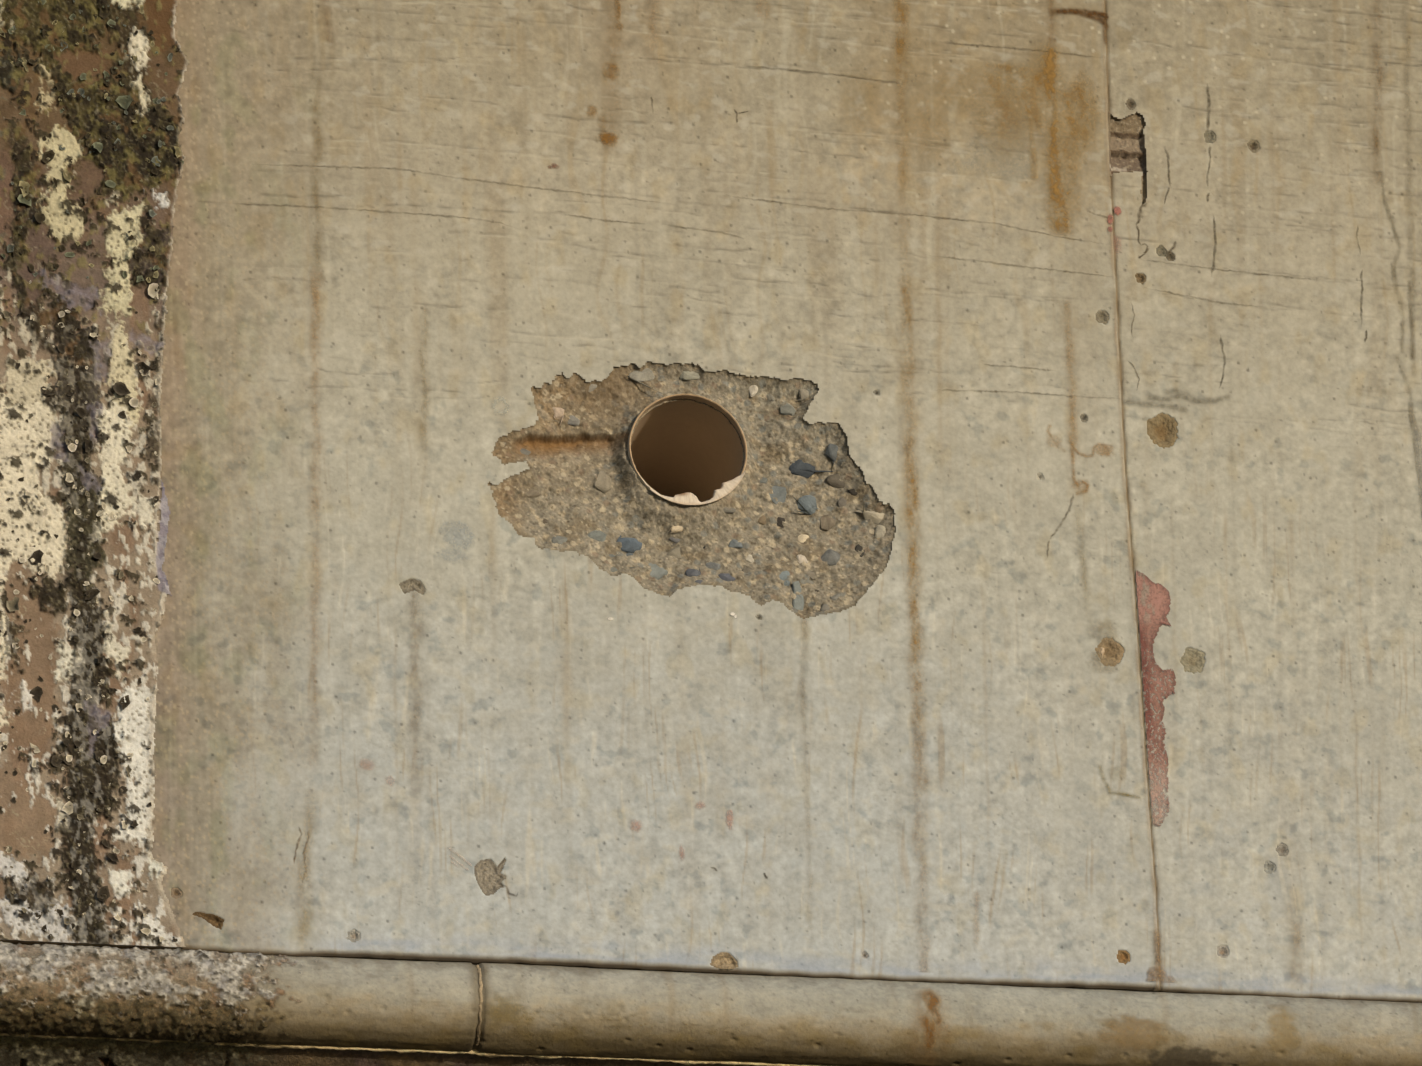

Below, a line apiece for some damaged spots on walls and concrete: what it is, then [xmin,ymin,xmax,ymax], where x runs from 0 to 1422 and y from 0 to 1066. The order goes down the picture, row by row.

rust [600,132,617,144]
rust [989,48,1094,232]
spalling [1108,111,1148,205]
spalling [488,361,896,619]
peeling [1136,571,1176,826]
peeling [474,858,506,896]